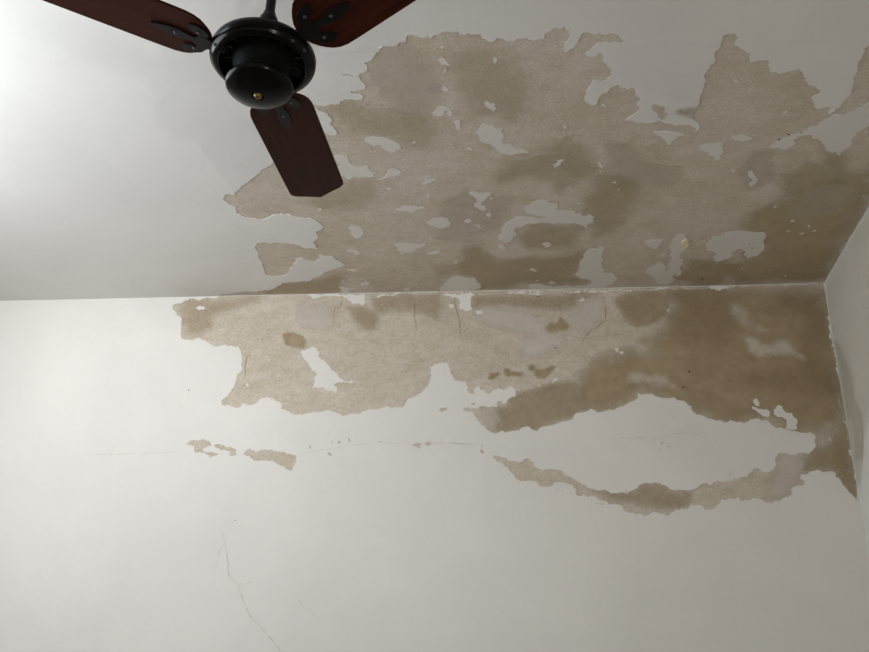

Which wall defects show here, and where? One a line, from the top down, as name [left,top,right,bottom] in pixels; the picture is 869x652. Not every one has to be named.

leakage [178,270,350,338]
leakage [283,332,307,349]
leakage [344,292,444,336]
peeling [173,26,869,516]
leakage [433,133,869,501]
leakage [587,482,695,512]